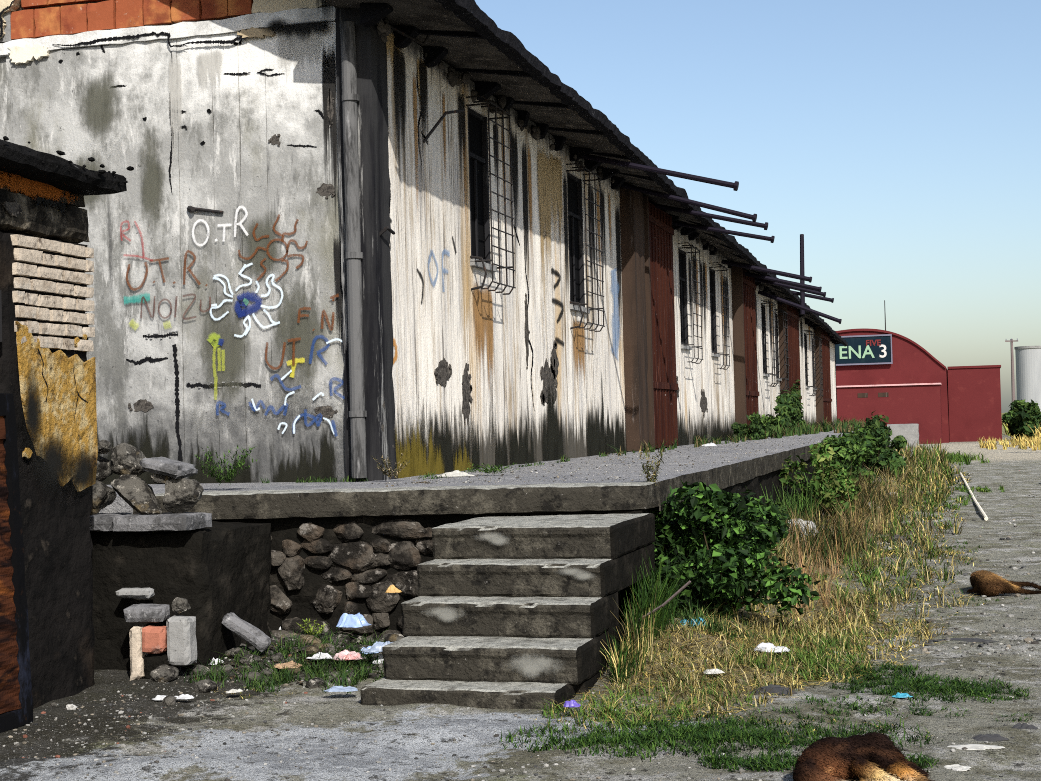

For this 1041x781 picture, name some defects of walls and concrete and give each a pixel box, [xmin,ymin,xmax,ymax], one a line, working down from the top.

leakage [80,76,114,134]
corrosion [0,171,70,202]
leakage [77,158,101,171]
leakage [84,195,99,208]
leakage [141,138,163,225]
peeling [15,321,98,492]
spalling [128,399,154,412]
leakage [394,414,480,477]
leakage [496,396,566,467]
leakage [586,375,626,457]